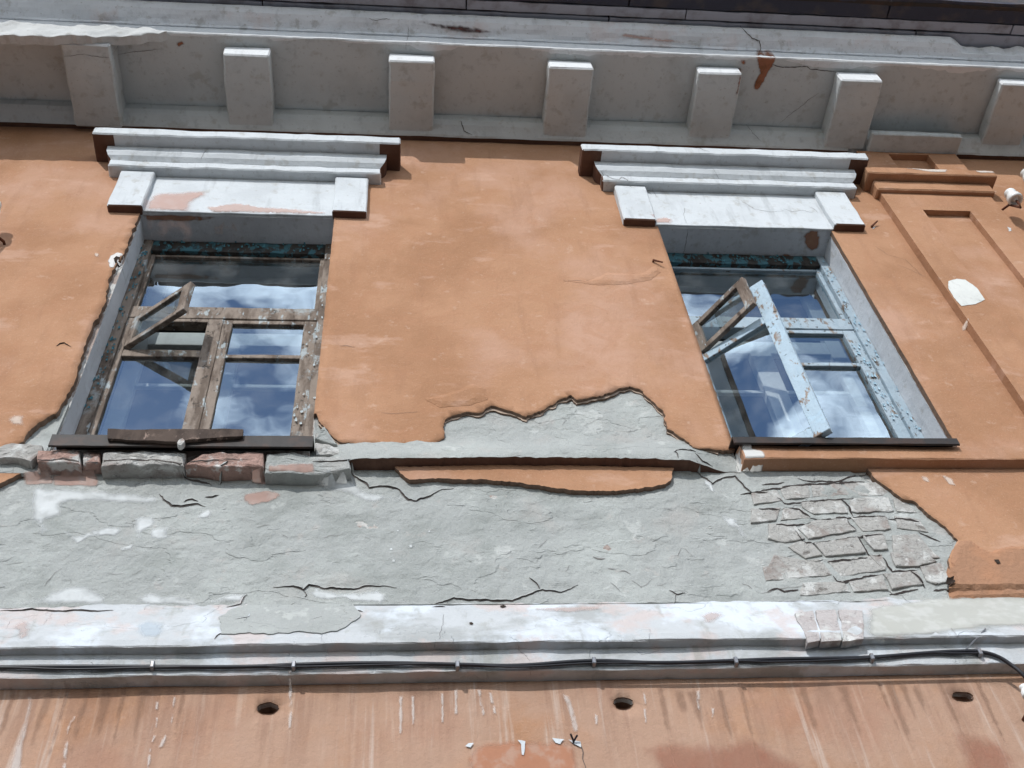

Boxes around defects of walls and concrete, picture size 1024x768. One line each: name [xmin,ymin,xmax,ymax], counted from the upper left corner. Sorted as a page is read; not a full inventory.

corrosion [737,51,775,94]
crack [740,25,834,120]
flaking render [948,279,985,306]
crack [33,457,241,507]
crack [327,459,453,501]
flaking render [0,391,1024,649]
crack [0,568,107,612]
crack [281,583,396,619]
crack [434,567,575,639]
crack [594,557,683,603]